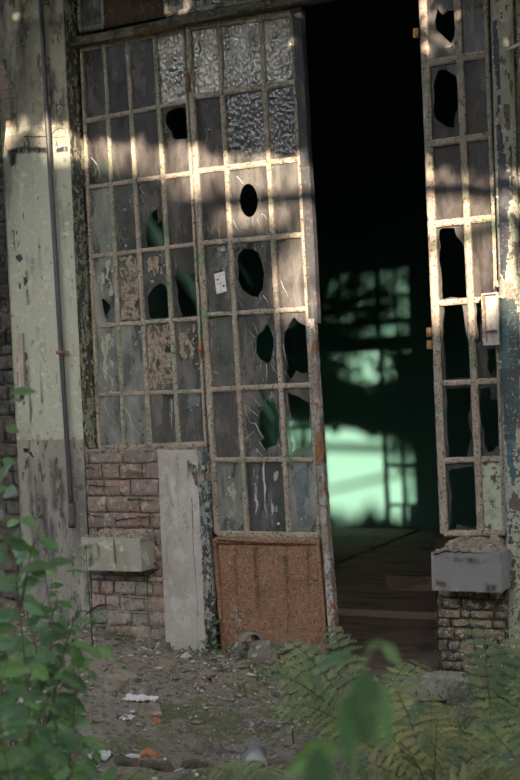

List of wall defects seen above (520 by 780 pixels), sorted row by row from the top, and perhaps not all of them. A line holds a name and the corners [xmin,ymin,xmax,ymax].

peeling [489,9,520,544]
peeling [188,463,216,643]